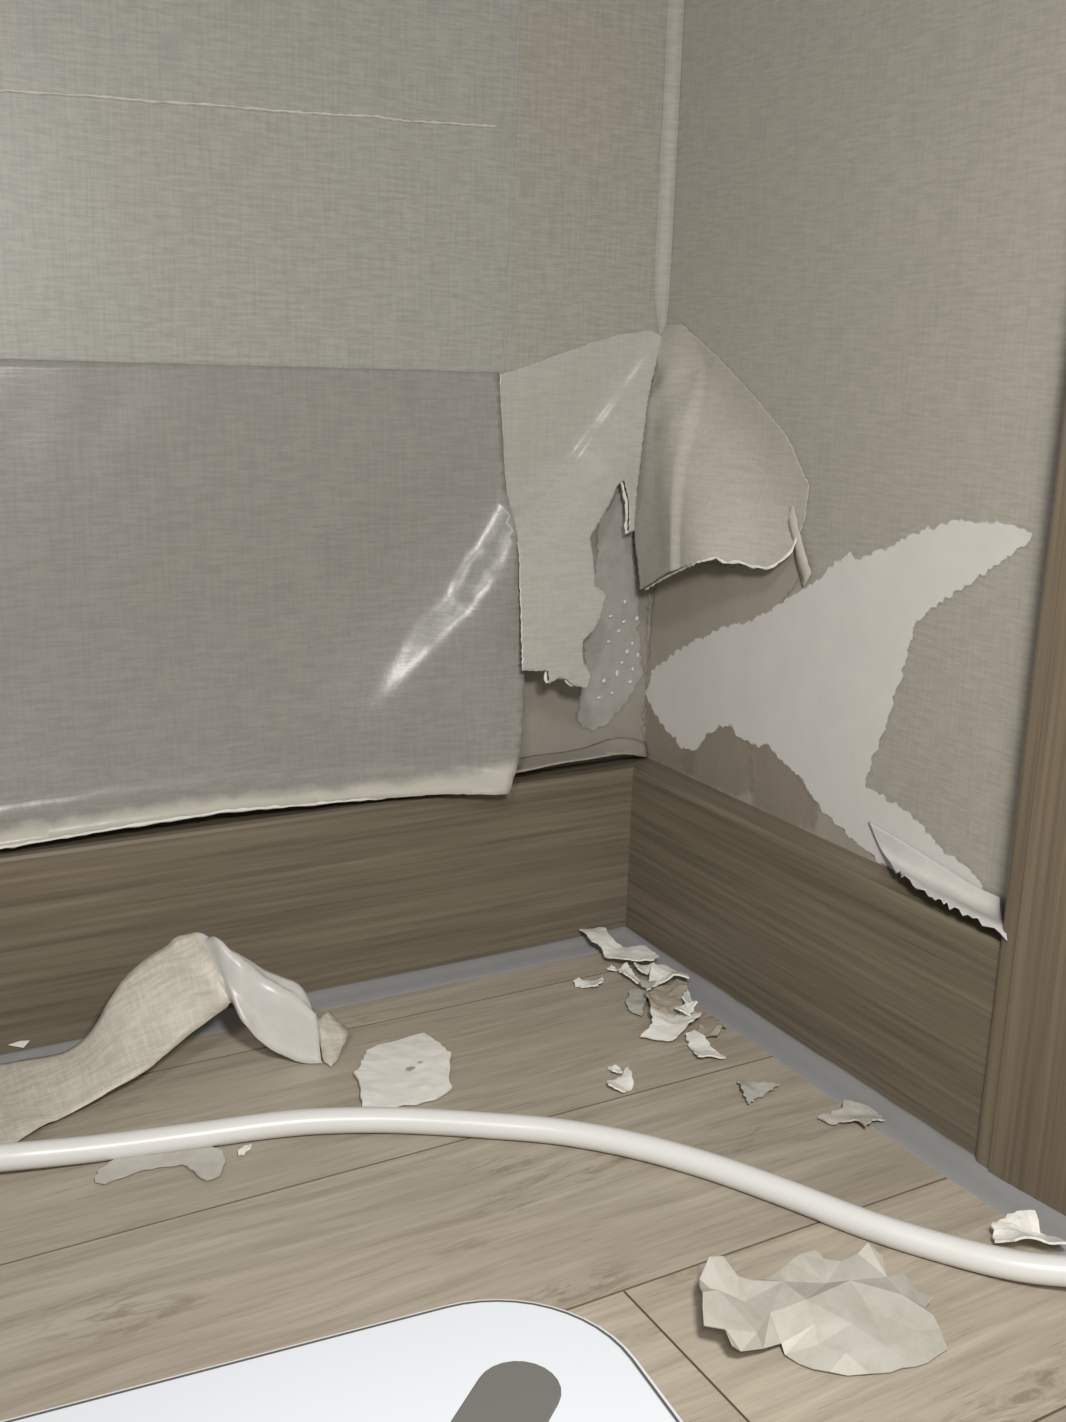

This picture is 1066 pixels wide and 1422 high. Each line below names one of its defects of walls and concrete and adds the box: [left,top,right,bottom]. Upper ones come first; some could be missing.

peeling [520,503,1032,889]
peeling [682,990,698,1012]